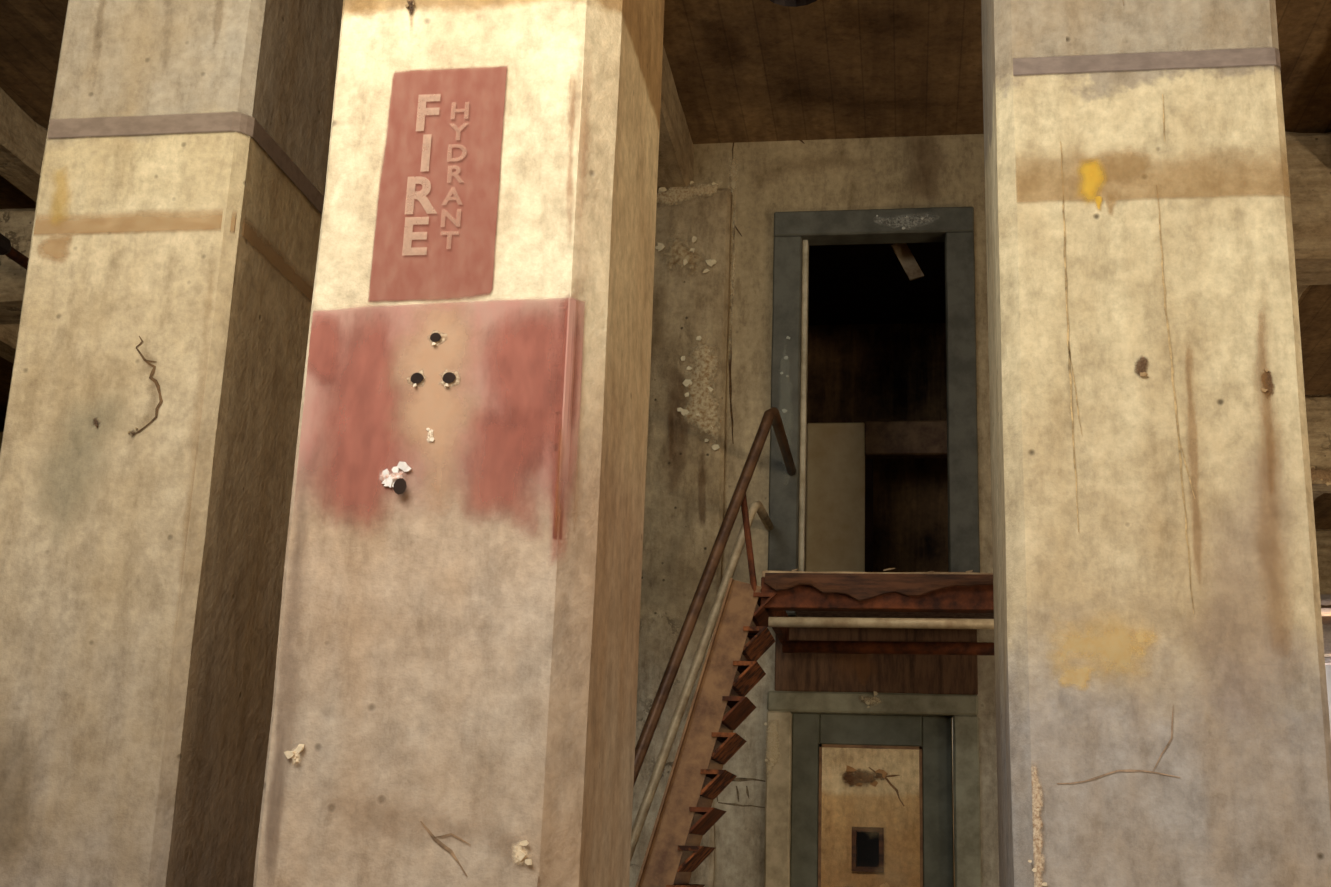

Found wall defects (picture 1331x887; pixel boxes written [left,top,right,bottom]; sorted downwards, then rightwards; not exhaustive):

crack [134,336,163,435]
peeling [297,298,585,539]